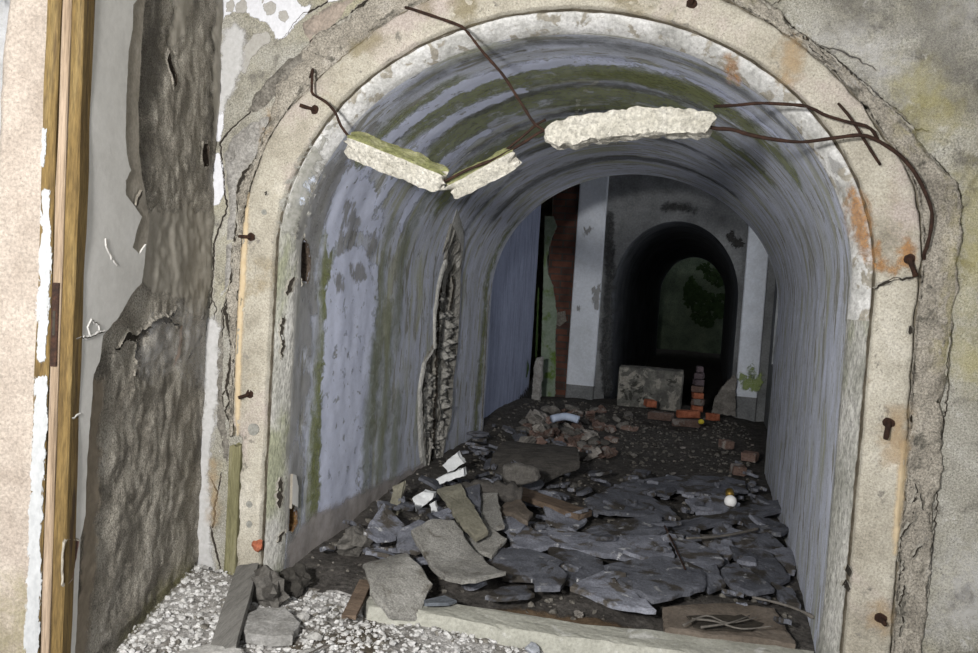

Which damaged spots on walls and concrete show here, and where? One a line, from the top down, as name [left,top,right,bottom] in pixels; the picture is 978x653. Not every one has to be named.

crack [282,0,368,50]
crack [76,111,270,437]
flaking render [200,0,354,292]
peeling [278,125,354,569]
damp [434,185,452,214]
damp [474,222,517,431]
damp [377,49,800,185]
damp [600,213,616,395]
damp [494,142,732,219]
crack [761,0,962,235]
corrosion [847,188,915,275]
crack [872,276,915,291]